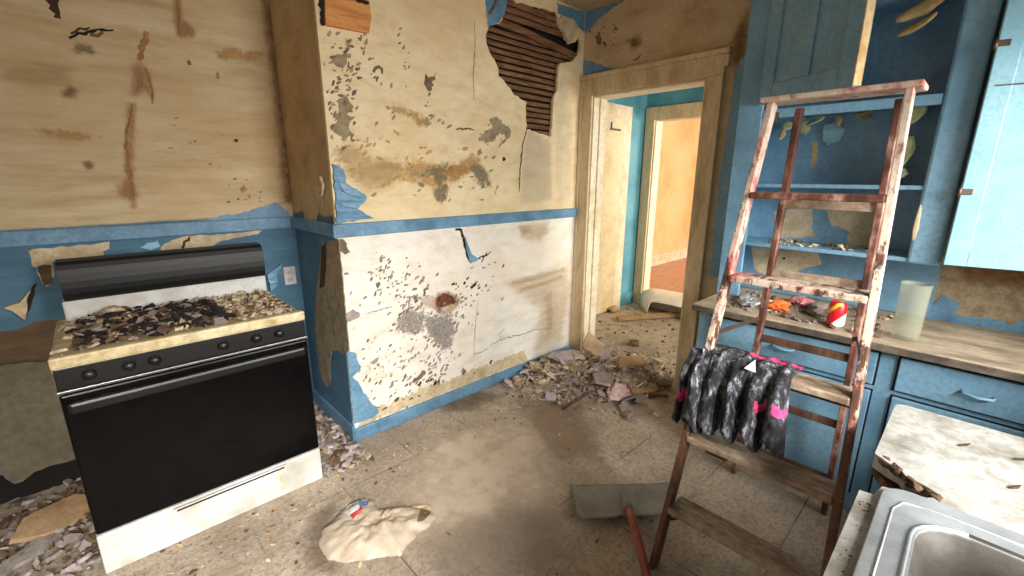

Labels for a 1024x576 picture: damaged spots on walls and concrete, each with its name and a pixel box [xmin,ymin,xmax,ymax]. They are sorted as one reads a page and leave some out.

peeling [896,0,945,37]
flaking render [485,0,624,136]
peeling [318,0,393,224]
water stain [329,121,499,202]
crack [519,127,527,192]
peeling [751,208,821,275]
peeling [827,210,875,246]
flaking render [0,241,110,365]
peeling [315,236,528,427]
flaking render [924,261,1024,334]